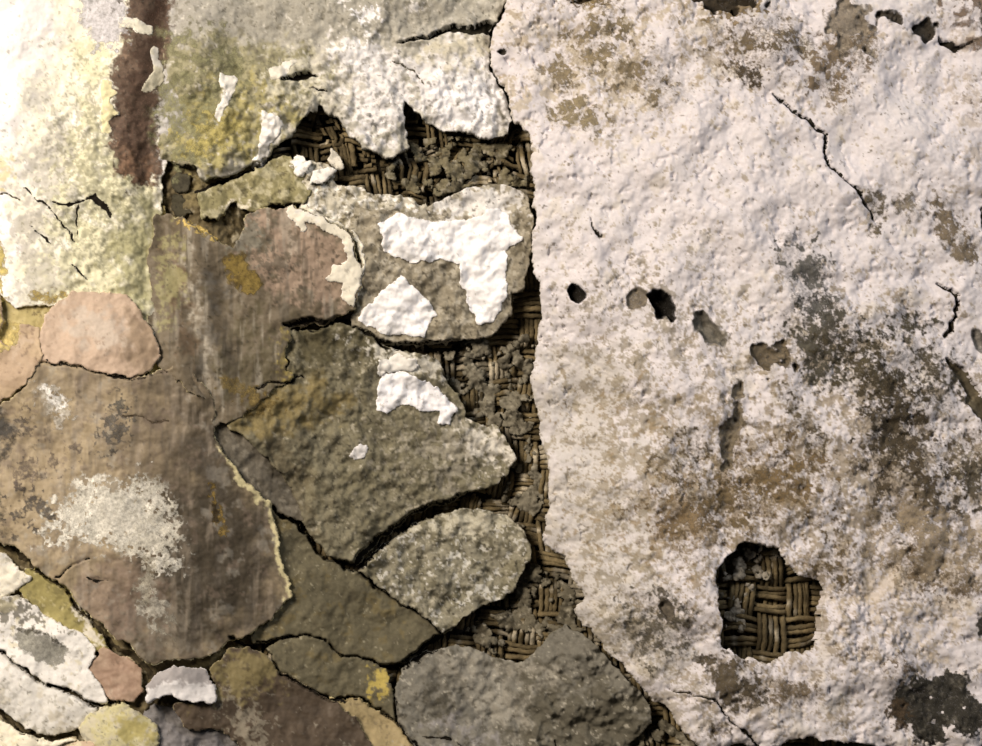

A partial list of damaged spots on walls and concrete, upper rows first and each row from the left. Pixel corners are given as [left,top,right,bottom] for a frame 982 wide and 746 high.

peeling [214,72,238,122]
peeling [251,110,284,170]
flaking render [290,148,344,184]
crack [773,94,873,221]
crack [0,187,112,279]
peeling [286,204,437,338]
peeling [378,208,523,325]
crack [938,285,960,338]
peeling [376,353,458,425]
peeling [0,290,413,746]
damp [613,585,818,740]
damp [880,650,982,746]